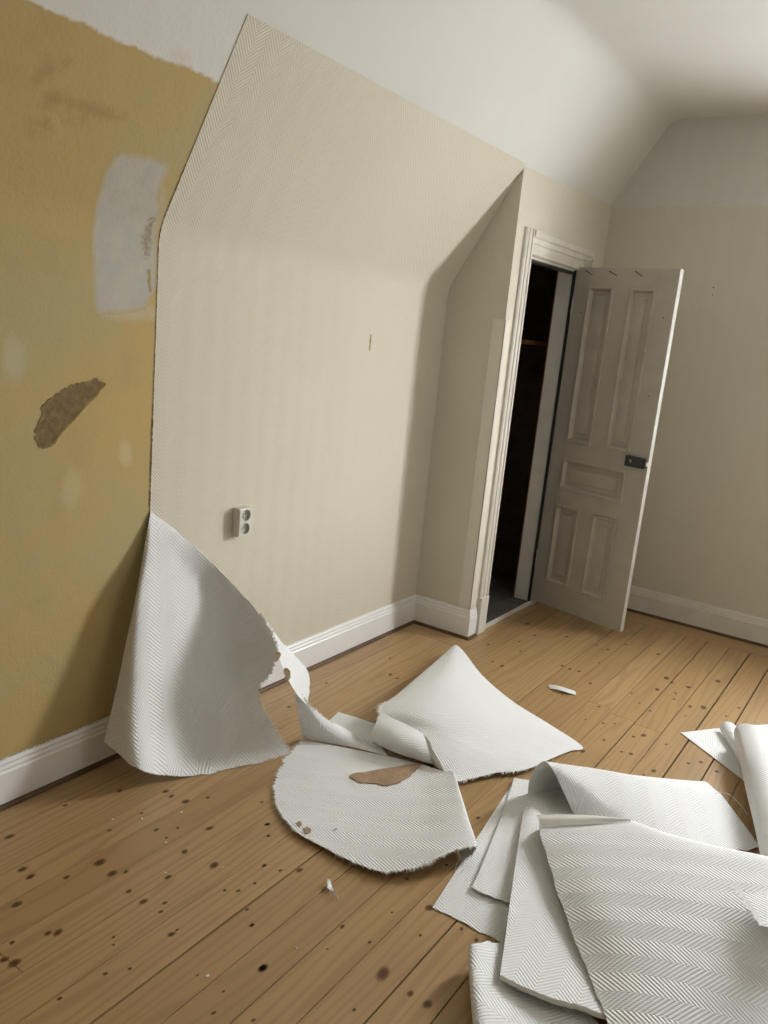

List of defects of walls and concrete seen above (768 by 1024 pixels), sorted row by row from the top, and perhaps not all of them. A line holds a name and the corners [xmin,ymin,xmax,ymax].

peeling [34,378,106,449]